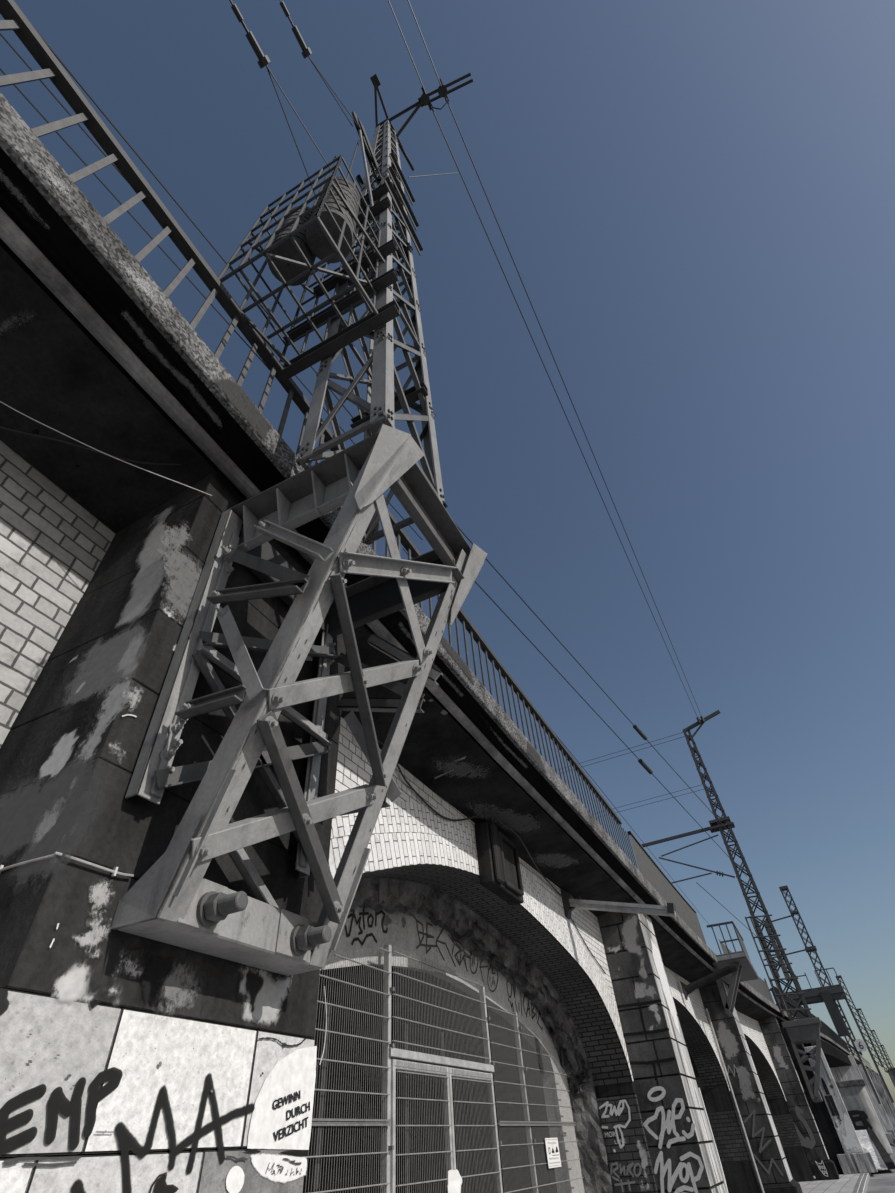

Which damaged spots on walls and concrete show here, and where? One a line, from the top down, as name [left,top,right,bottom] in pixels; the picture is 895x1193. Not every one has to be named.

peeling [75,882,112,957]
peeling [117,956,142,978]
peeling [622,915,656,999]
spalling [349,878,613,1193]